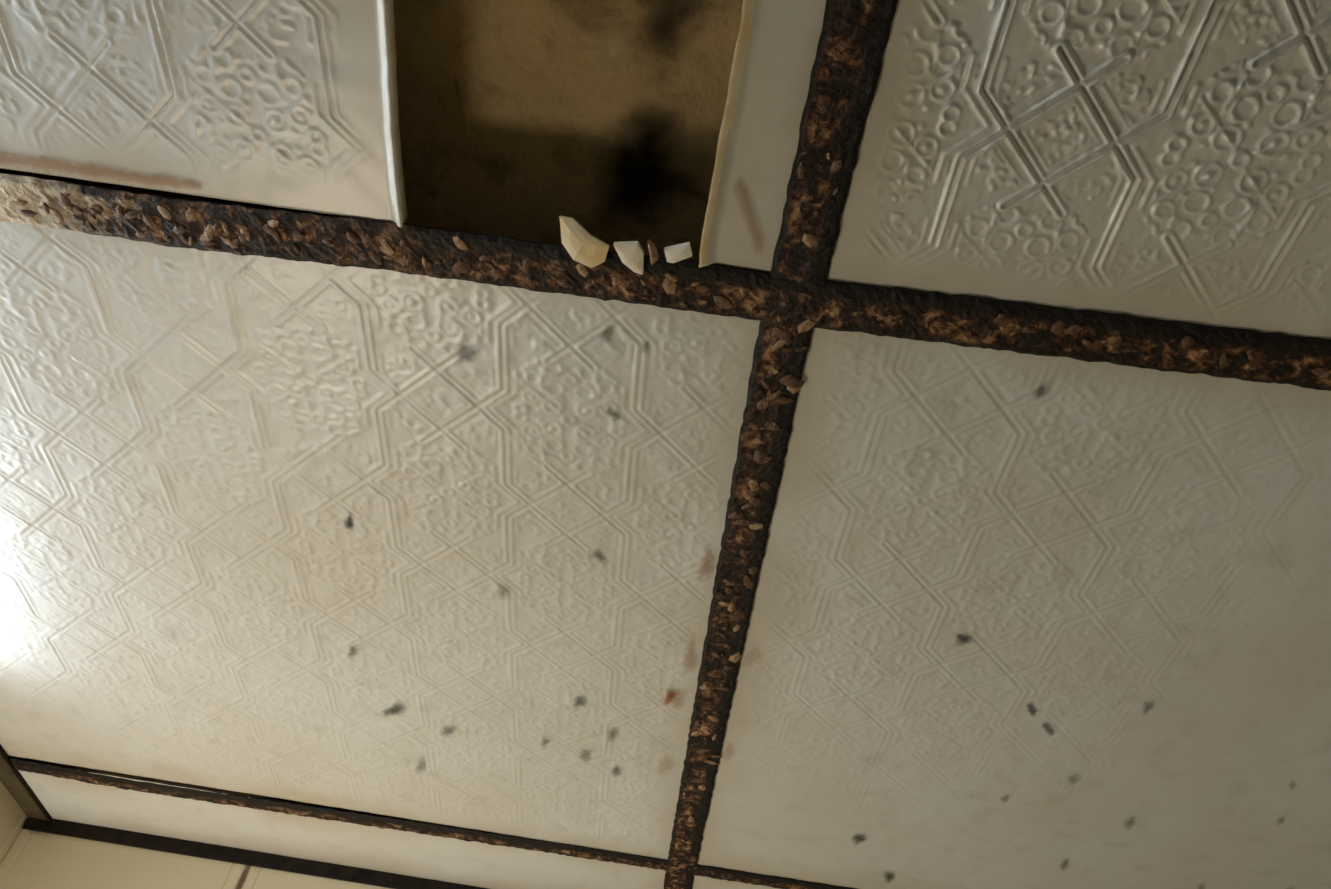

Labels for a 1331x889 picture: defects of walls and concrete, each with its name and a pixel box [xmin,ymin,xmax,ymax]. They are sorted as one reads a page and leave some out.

water stain [647,0,693,49]
water stain [605,122,680,220]
corrosion [12,192,504,279]
peeling [559,215,692,275]
corrosion [802,233,816,248]
corrosion [550,259,651,300]
corrosion [662,272,734,309]
corrosion [771,319,816,352]
corrosion [740,374,804,464]
corrosion [728,479,771,530]
corrosion [717,550,759,632]
corrosion [625,685,732,889]